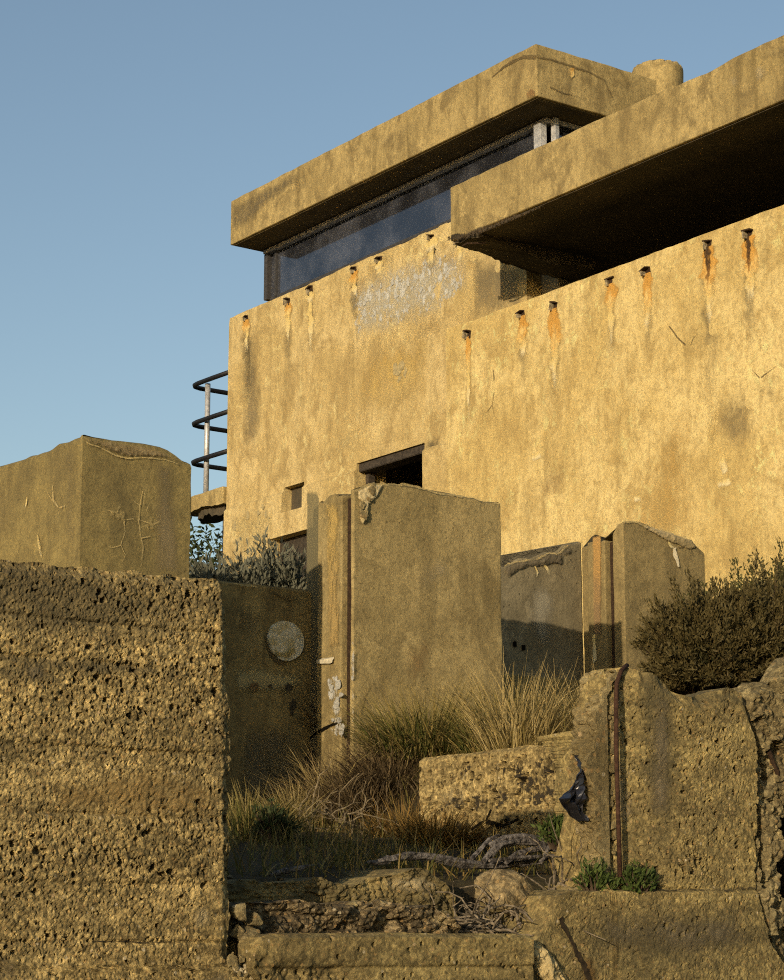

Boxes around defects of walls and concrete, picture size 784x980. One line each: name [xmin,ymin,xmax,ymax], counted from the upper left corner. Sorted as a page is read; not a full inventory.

crack [492,55,613,97]
peeling [355,255,462,332]
corrosion [699,245,718,320]
corrosion [741,234,758,297]
corrosion [547,308,562,382]
crack [108,491,158,554]
spalling [358,482,500,523]
spalling [504,546,571,576]
spalling [732,657,784,962]
crack [229,903,263,958]
crack [559,916,597,980]